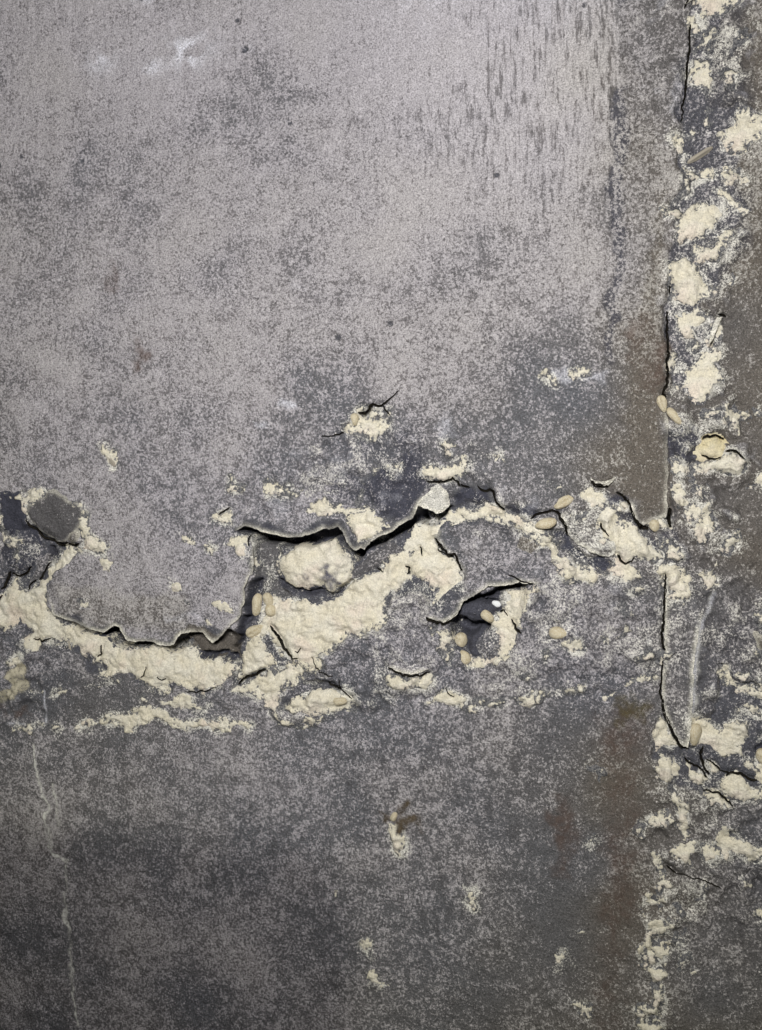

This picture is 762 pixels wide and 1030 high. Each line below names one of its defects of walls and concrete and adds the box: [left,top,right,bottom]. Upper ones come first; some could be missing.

crack [680,0,691,122]
crack [662,286,671,398]
peeling [0,472,615,708]
leakage [632,784,696,1030]
leakage [570,1001,594,1019]